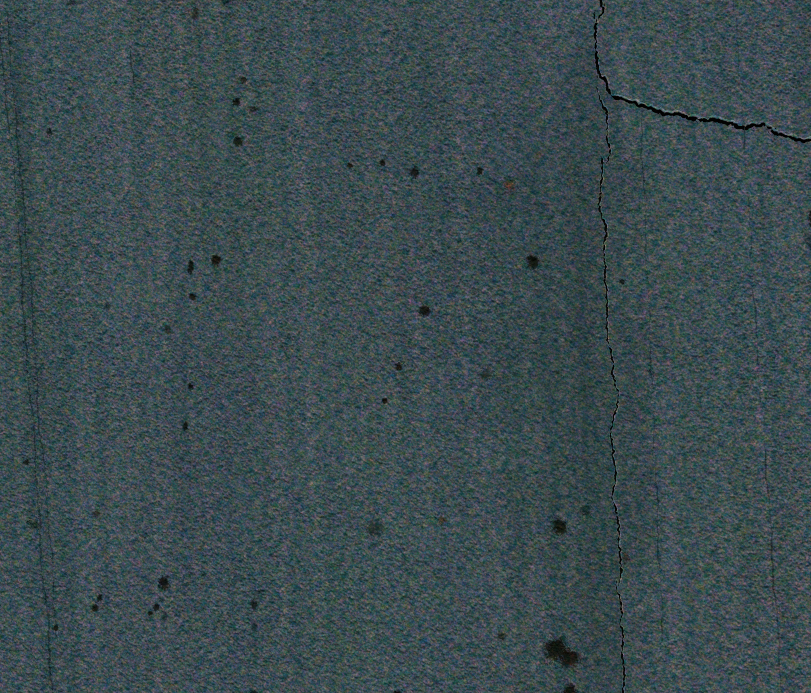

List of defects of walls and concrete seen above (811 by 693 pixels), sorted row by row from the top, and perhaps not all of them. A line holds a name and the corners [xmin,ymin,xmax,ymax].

crack [592,0,811,693]